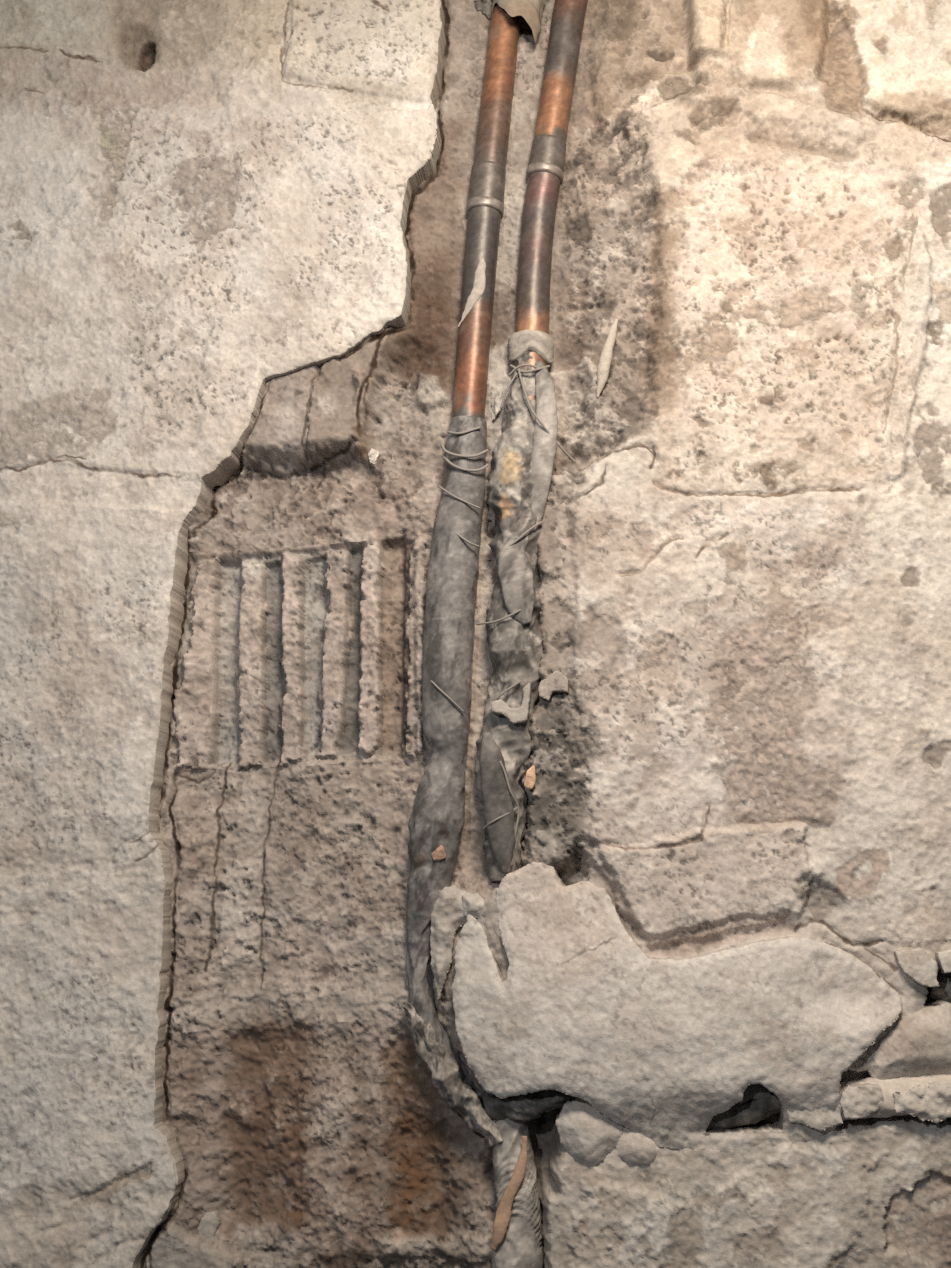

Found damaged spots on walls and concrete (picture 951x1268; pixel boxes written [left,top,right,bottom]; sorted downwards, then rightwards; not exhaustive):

crack [870,111,951,142]
crack [0,454,99,471]
peeling [894,947,951,987]
peeling [83,1131,185,1215]
peeling [198,1210,221,1240]